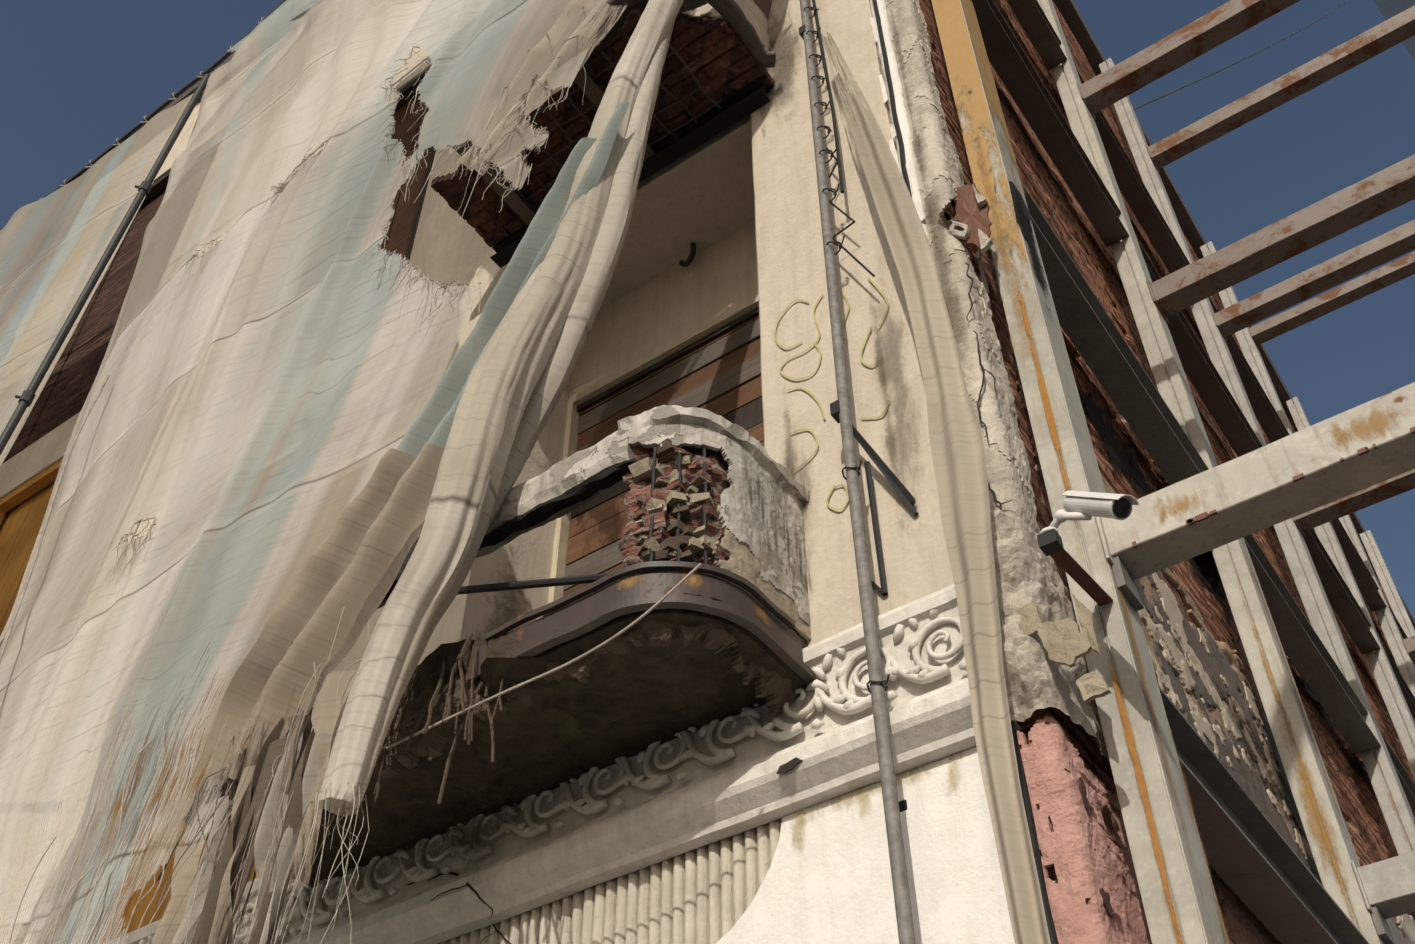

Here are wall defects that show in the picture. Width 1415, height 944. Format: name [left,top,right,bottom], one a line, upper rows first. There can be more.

peeling [870,0,994,264]
rust [931,0,1070,491]
flaking render [628,438,718,563]
crack [965,262,998,442]
peeling [958,282,1044,494]
crack [988,484,1014,511]
rust [1335,411,1393,441]
peeling [1018,592,1111,704]
rust [1108,659,1183,944]
rust [1119,589,1191,811]
peeling [1137,568,1323,886]
peeling [1386,914,1415,944]